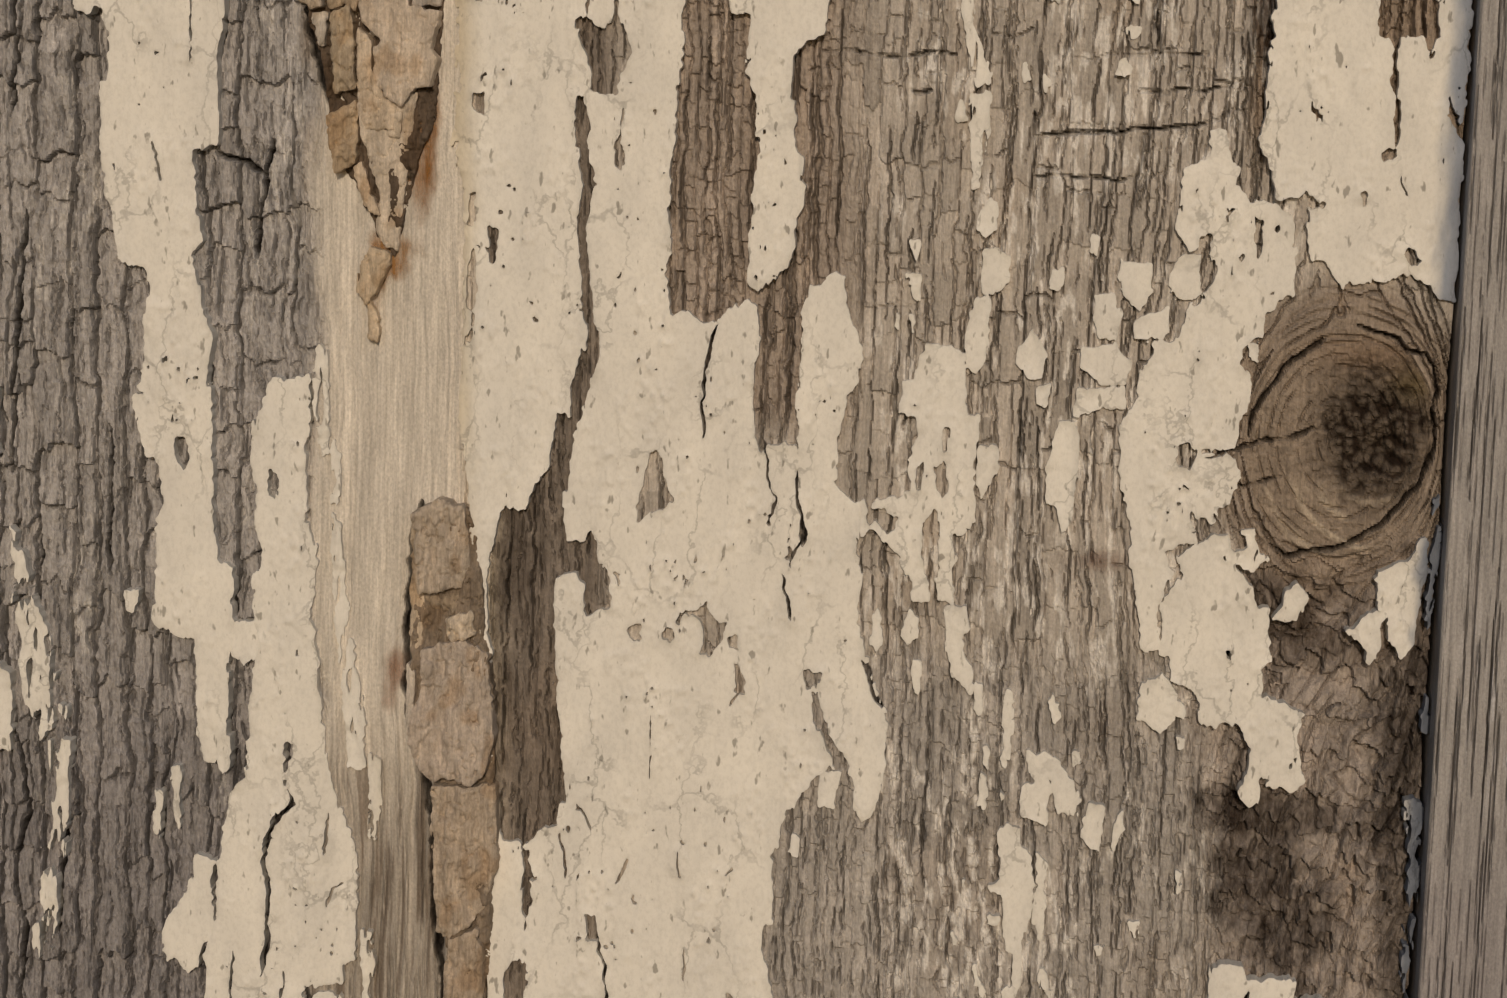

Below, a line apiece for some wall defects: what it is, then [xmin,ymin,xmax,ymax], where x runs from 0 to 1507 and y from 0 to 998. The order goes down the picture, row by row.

peeling [1022,62,1051,93]
peeling [73,0,384,998]
peeling [298,0,1011,998]
peeling [1016,329,1051,408]
peeling [1045,0,1474,808]
crack [1241,340,1321,445]
crack [1279,331,1439,556]
peeling [0,523,77,957]
peeling [972,687,1125,998]
peeling [1127,919,1140,938]
peeling [1207,959,1323,998]
peeling [1398,794,1425,998]